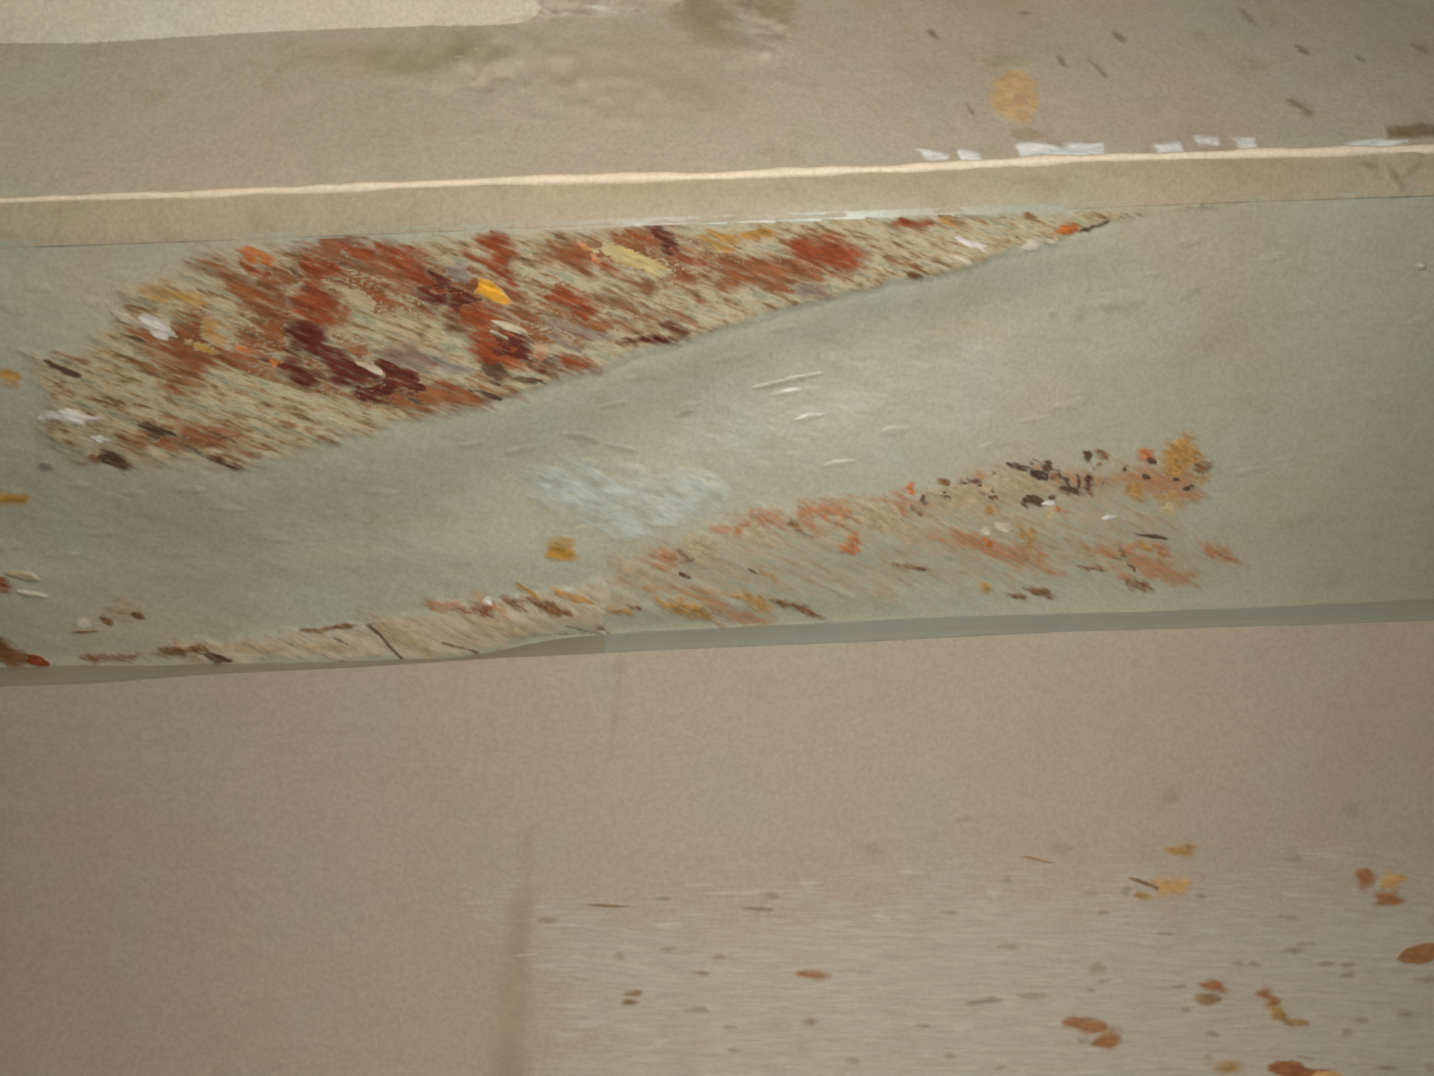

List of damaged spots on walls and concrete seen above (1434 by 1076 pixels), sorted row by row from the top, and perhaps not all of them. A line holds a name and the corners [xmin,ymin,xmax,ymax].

corrosion [978,50,1048,142]
corrosion [534,429,1253,636]
corrosion [0,562,49,606]
corrosion [0,625,57,667]
corrosion [1132,838,1206,906]
corrosion [1342,861,1415,911]
corrosion [1392,939,1434,967]
corrosion [1186,974,1315,1034]
corrosion [1055,1009,1129,1058]
corrosion [1206,1051,1348,1076]